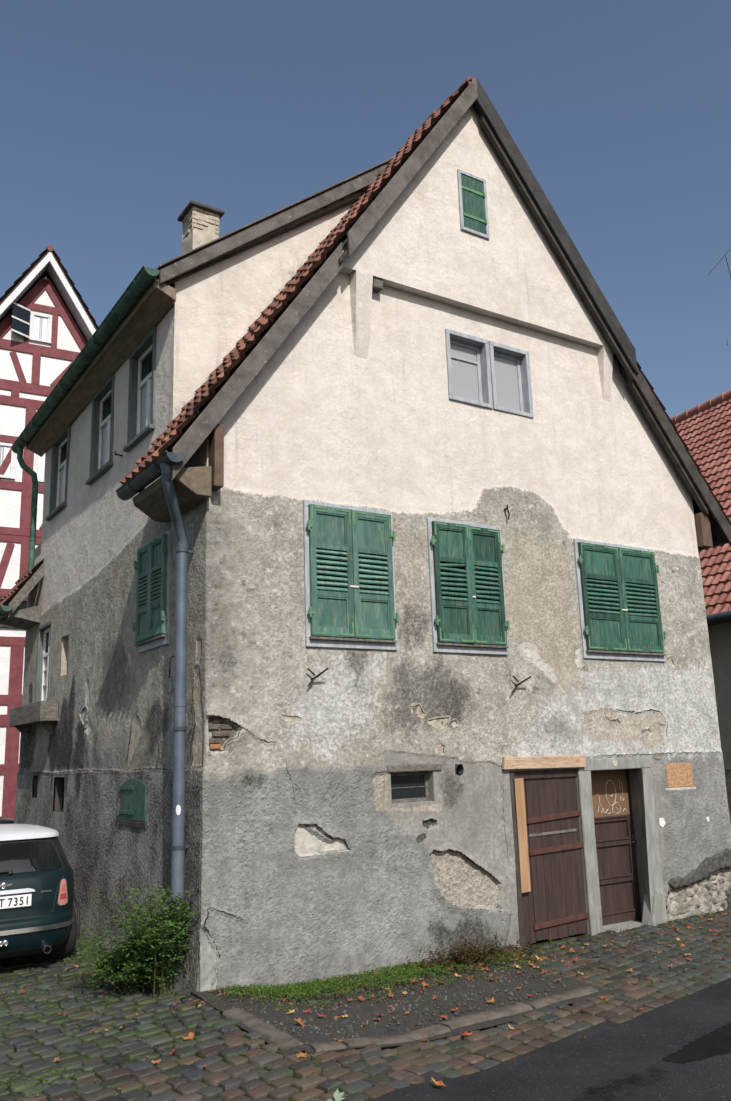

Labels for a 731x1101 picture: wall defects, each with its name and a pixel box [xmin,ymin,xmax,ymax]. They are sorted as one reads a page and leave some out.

damp [47,674,100,799]
flaking render [190,639,266,766]
peeling [409,702,460,755]
flaking render [288,816,353,857]
flaking render [416,814,503,916]